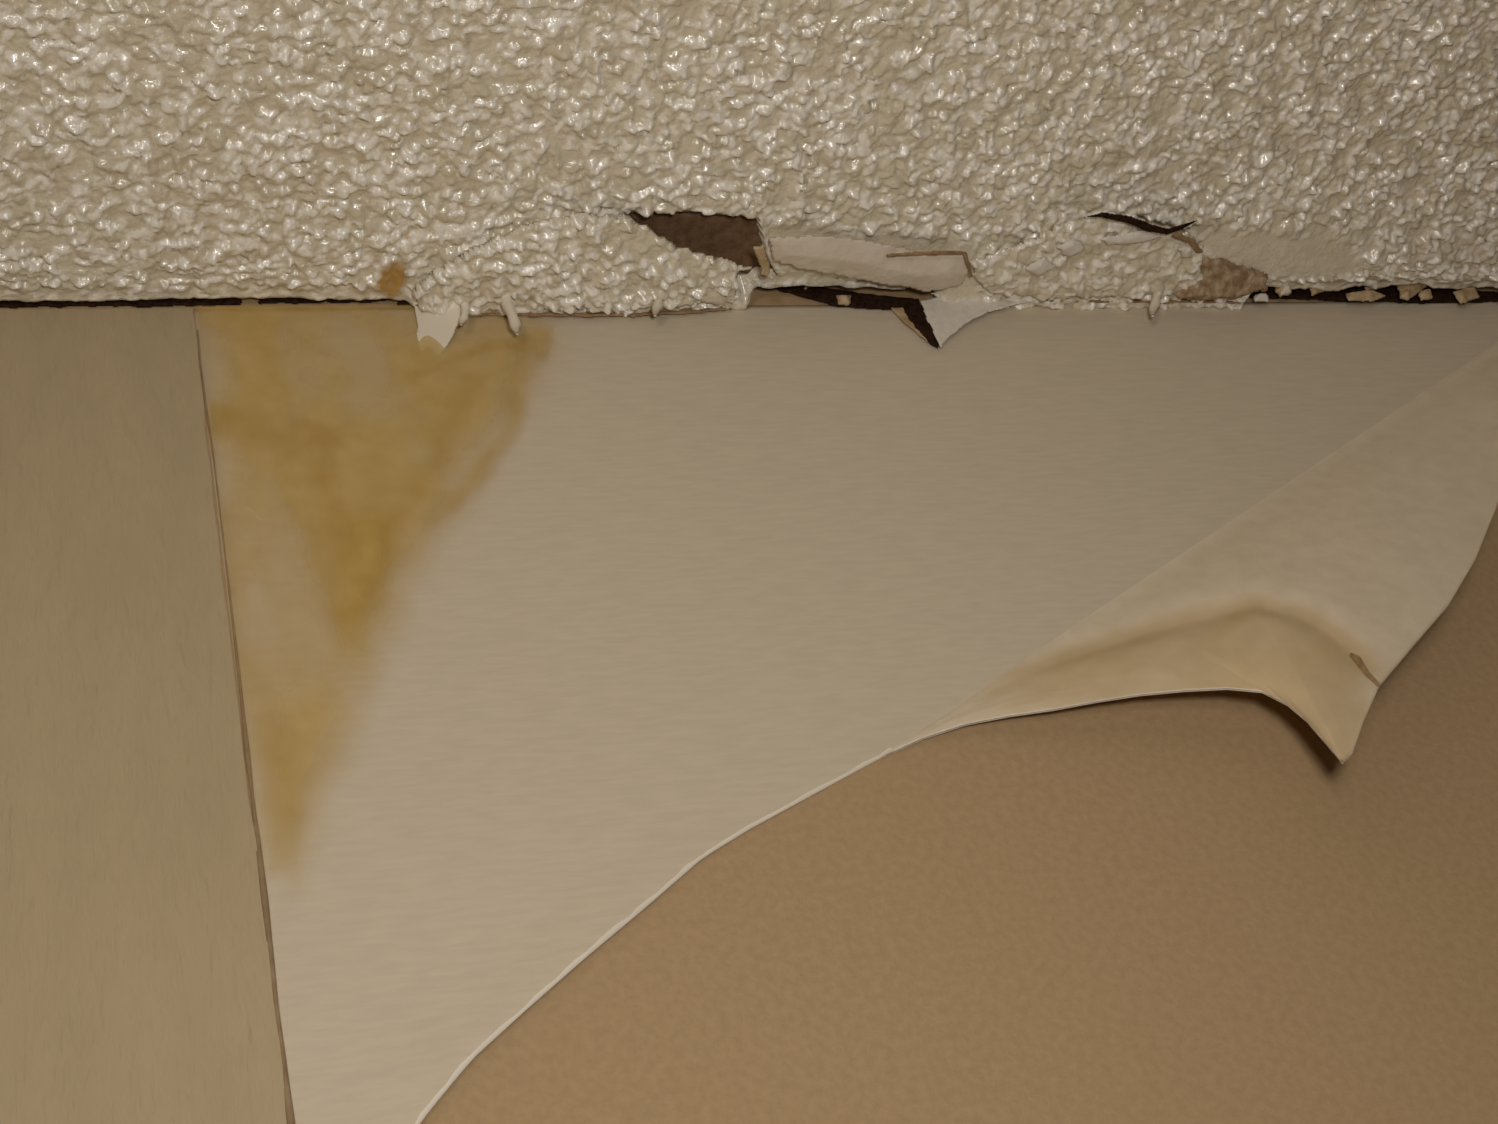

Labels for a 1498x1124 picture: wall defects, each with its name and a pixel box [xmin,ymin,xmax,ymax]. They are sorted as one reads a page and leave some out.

water stain [208,307,510,639]
peeling [882,342,1498,764]